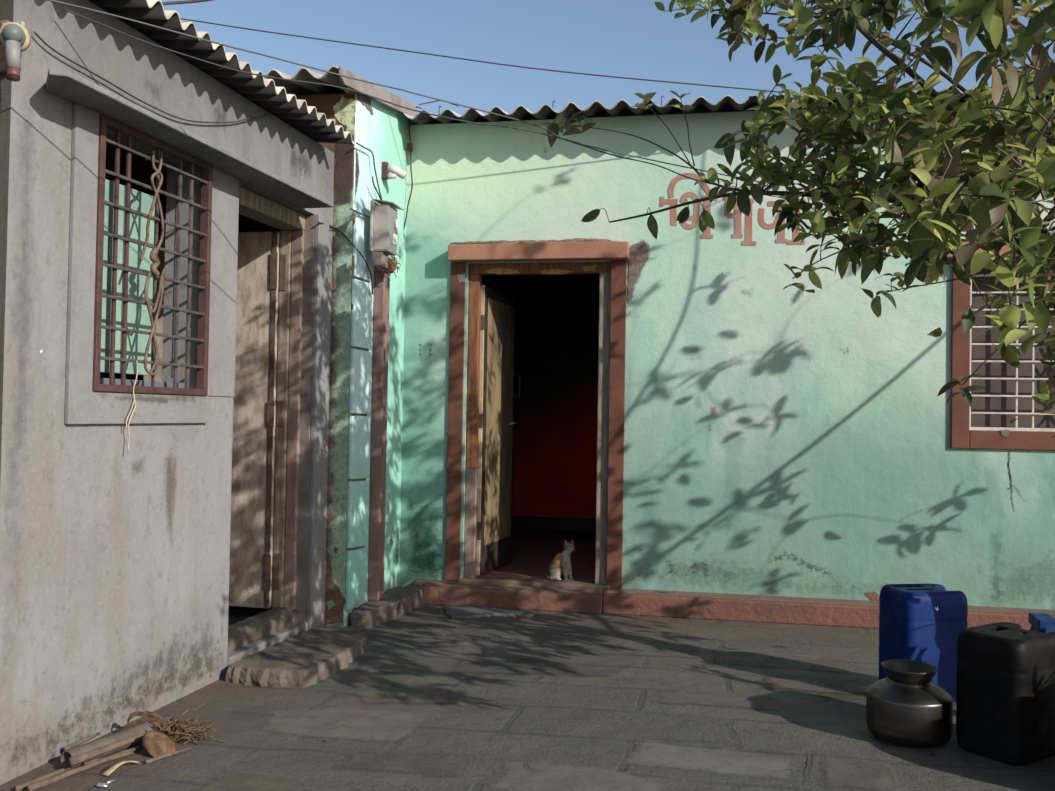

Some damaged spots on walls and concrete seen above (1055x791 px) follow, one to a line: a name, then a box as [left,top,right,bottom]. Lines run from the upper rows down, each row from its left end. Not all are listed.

water stain [335,143,359,205]
peeling [539,265,596,274]
flaking render [627,243,647,298]
crack [1008,452,1025,509]
peeling [325,547,346,624]